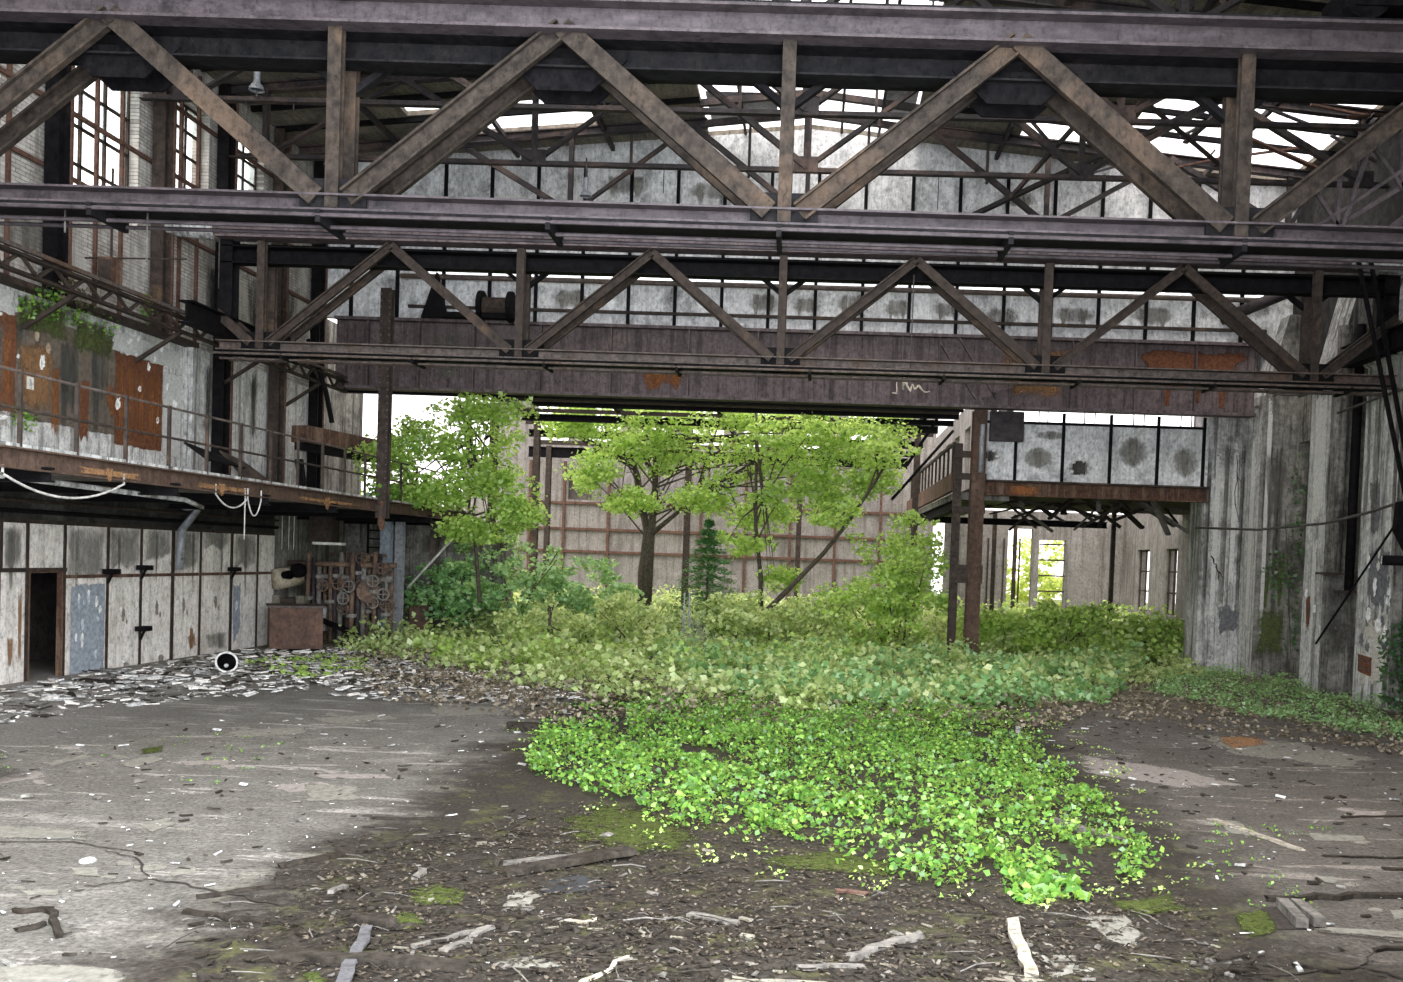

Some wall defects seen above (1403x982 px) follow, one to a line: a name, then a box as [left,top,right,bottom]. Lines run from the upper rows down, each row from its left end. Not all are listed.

corrosion [0,311,17,412]
corrosion [1141,350,1246,370]
corrosion [79,351,163,451]
leakage [1026,432,1062,467]
leakage [1120,438,1145,466]
corrosion [1011,486,1039,495]
leakage [1175,398,1284,640]
leakage [5,532,20,583]
leakage [70,530,255,589]